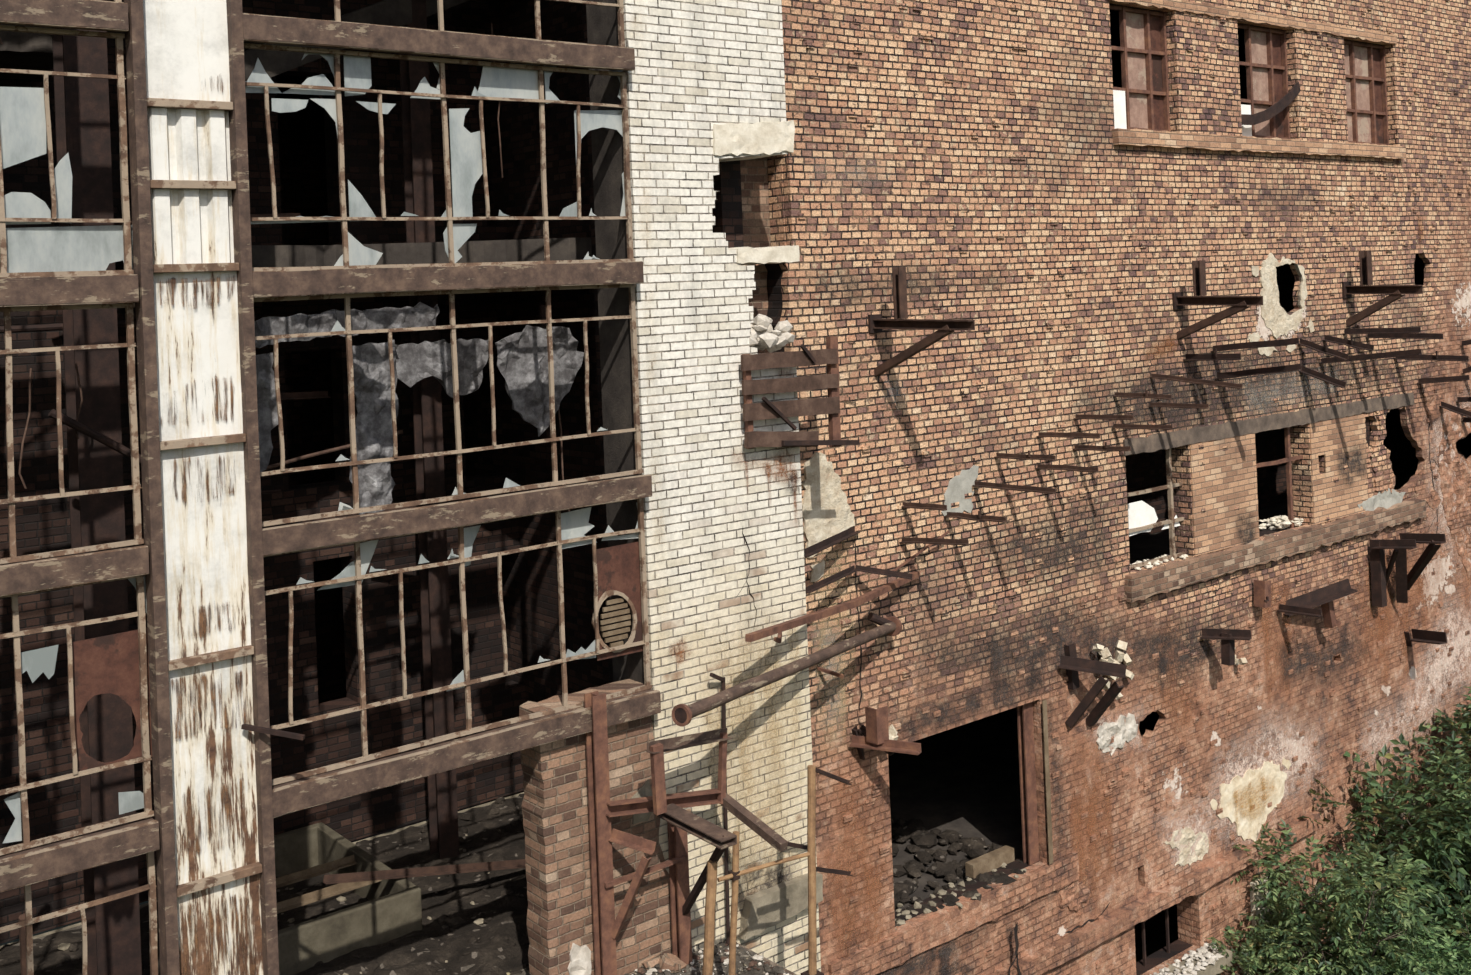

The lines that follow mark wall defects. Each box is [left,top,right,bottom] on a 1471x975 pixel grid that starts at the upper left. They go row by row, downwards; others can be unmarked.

corrosion [159,277,235,314]
peeling [1248,332,1296,356]
corrosion [161,375,233,425]
spalling [1358,280,1471,579]
corrosion [173,455,234,502]
corrosion [178,603,234,639]
spalling [1096,713,1139,756]
corrosion [182,778,242,856]
spalling [1164,827,1209,866]
corrosion [181,894,256,975]